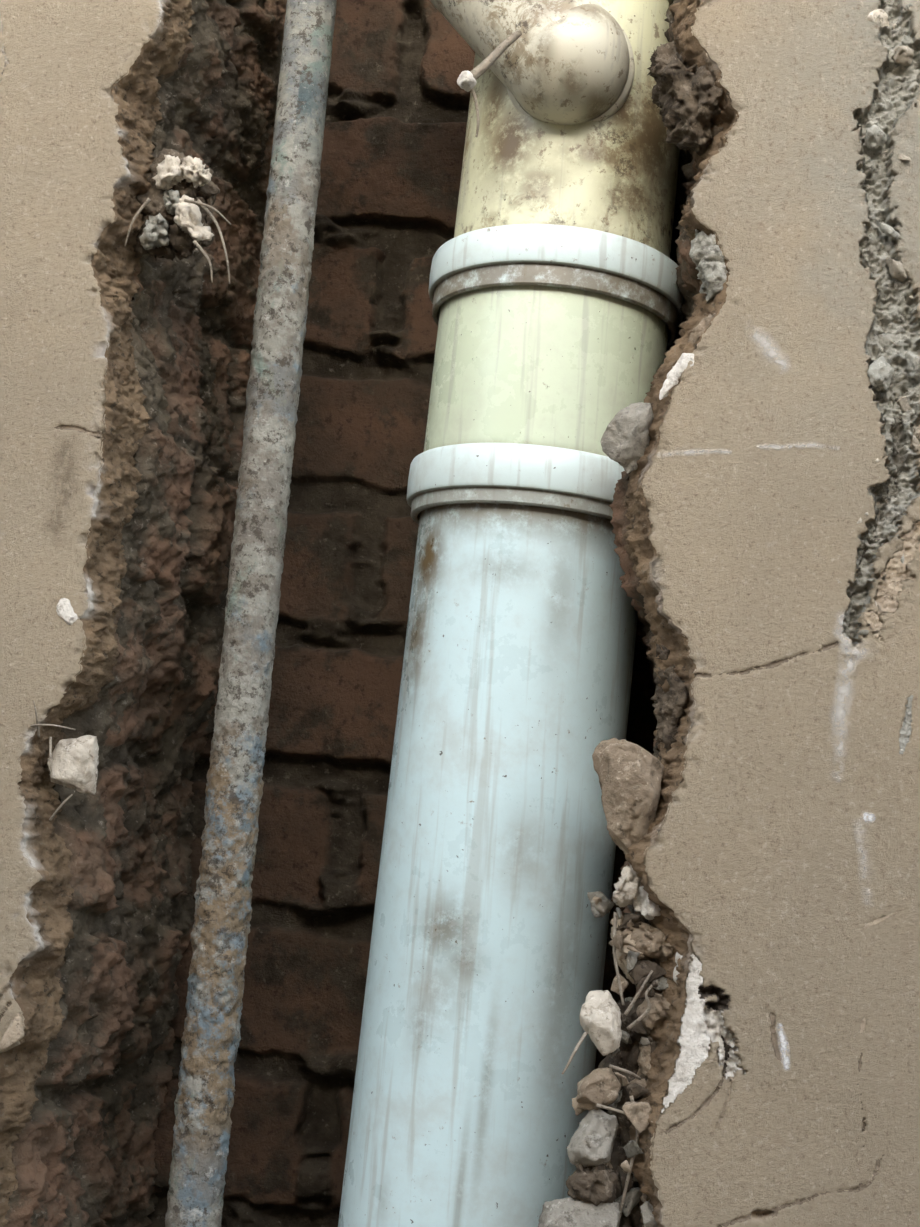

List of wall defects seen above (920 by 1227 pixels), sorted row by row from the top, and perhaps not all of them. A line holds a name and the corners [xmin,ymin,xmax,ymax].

spalling [0,0,195,1227]
spalling [610,0,746,1227]
crack [718,1016,885,1227]
crack [694,0,920,678]